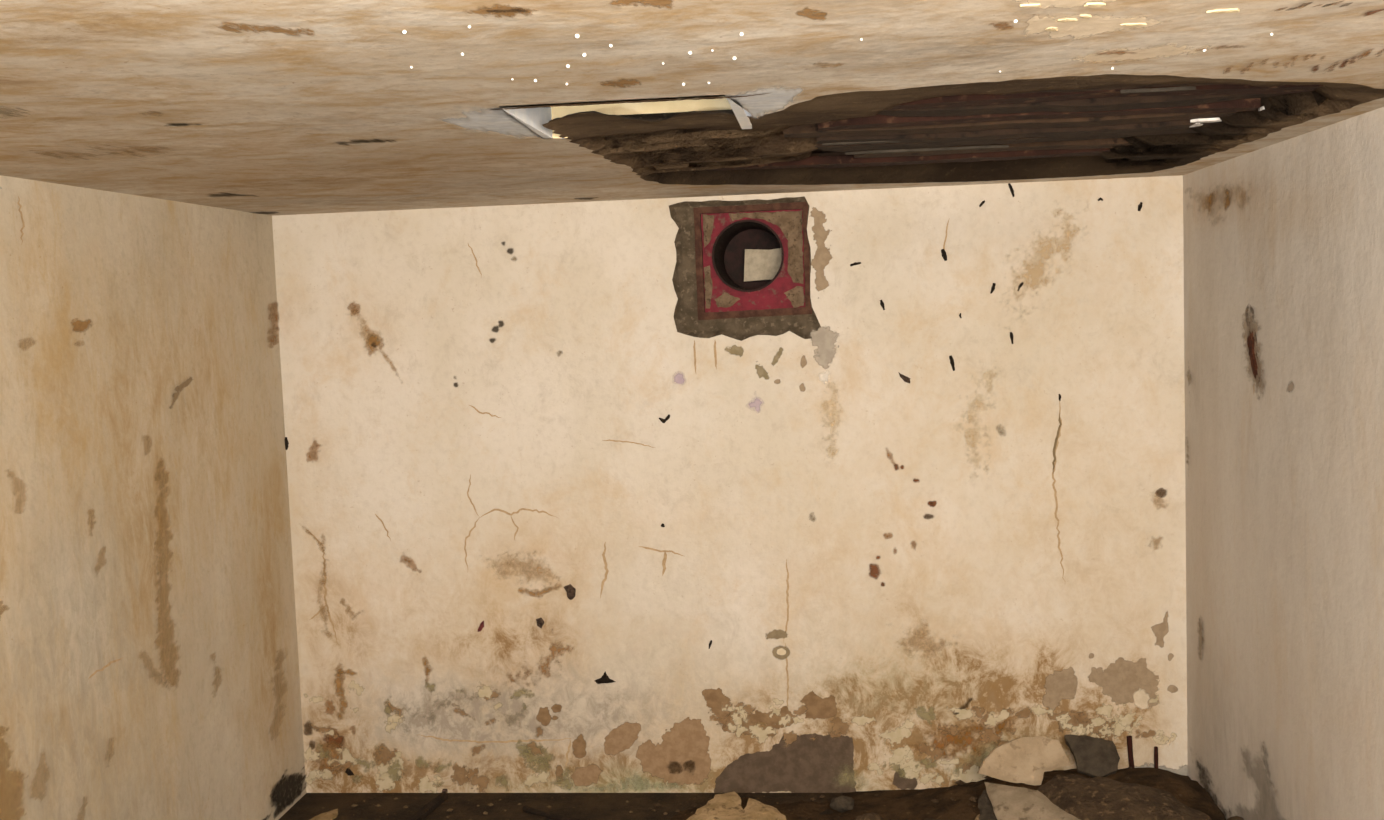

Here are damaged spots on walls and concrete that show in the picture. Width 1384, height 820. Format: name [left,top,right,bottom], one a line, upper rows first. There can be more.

leakage [219,22,314,35]
leakage [468,4,531,17]
leakage [611,0,672,8]
peeling [995,0,1159,39]
leakage [732,88,802,117]
spalling [542,45,1384,185]
crack [1052,401,1065,581]
crack [464,474,558,568]
leakage [766,630,790,659]
peeling [478,612,1178,793]
peeling [304,681,507,793]
flaking render [1134,763,1188,776]